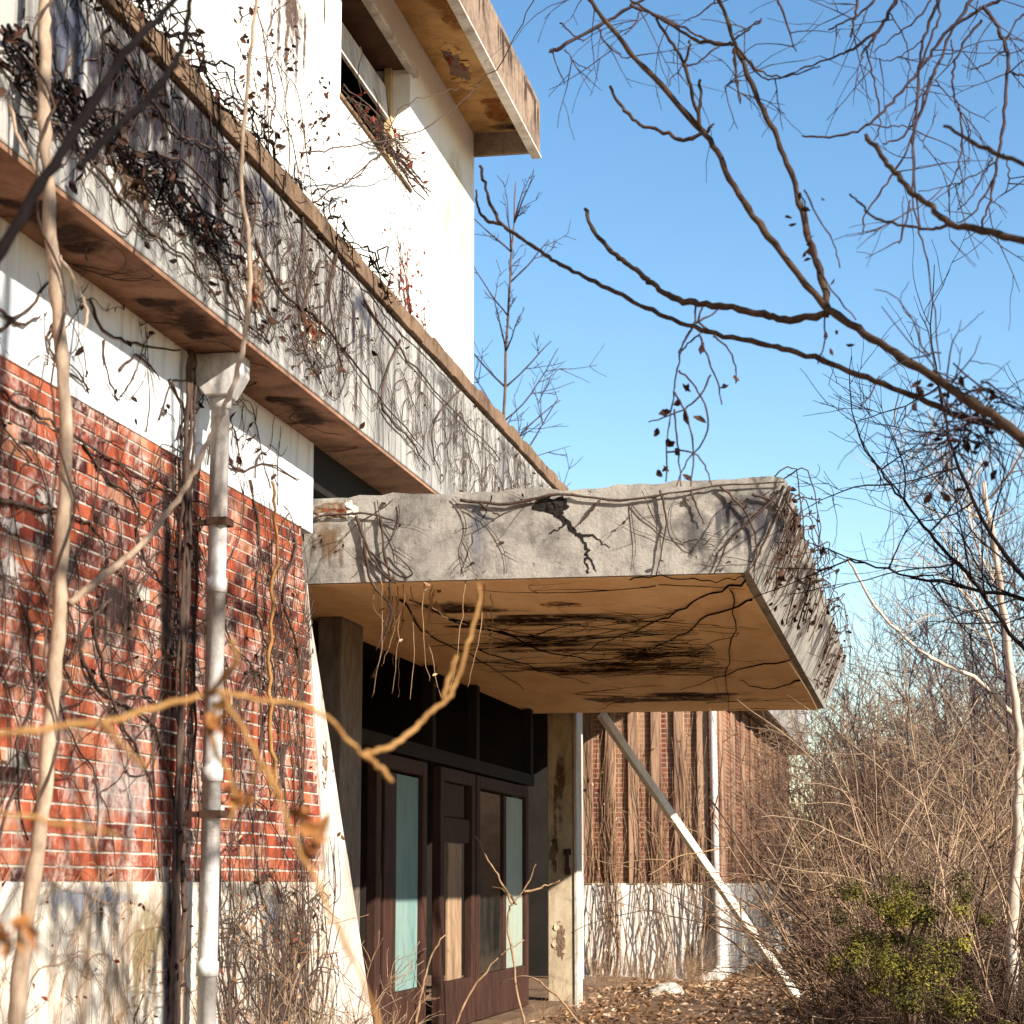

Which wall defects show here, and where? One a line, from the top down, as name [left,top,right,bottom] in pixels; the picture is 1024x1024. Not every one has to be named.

peeling [440,42,477,90]
water stain [137,299,219,339]
water stain [266,397,323,425]
spalling [313,499,358,521]
crack [549,515,610,573]
water stain [414,603,615,653]
water stain [525,663,677,675]
water stain [637,693,729,702]